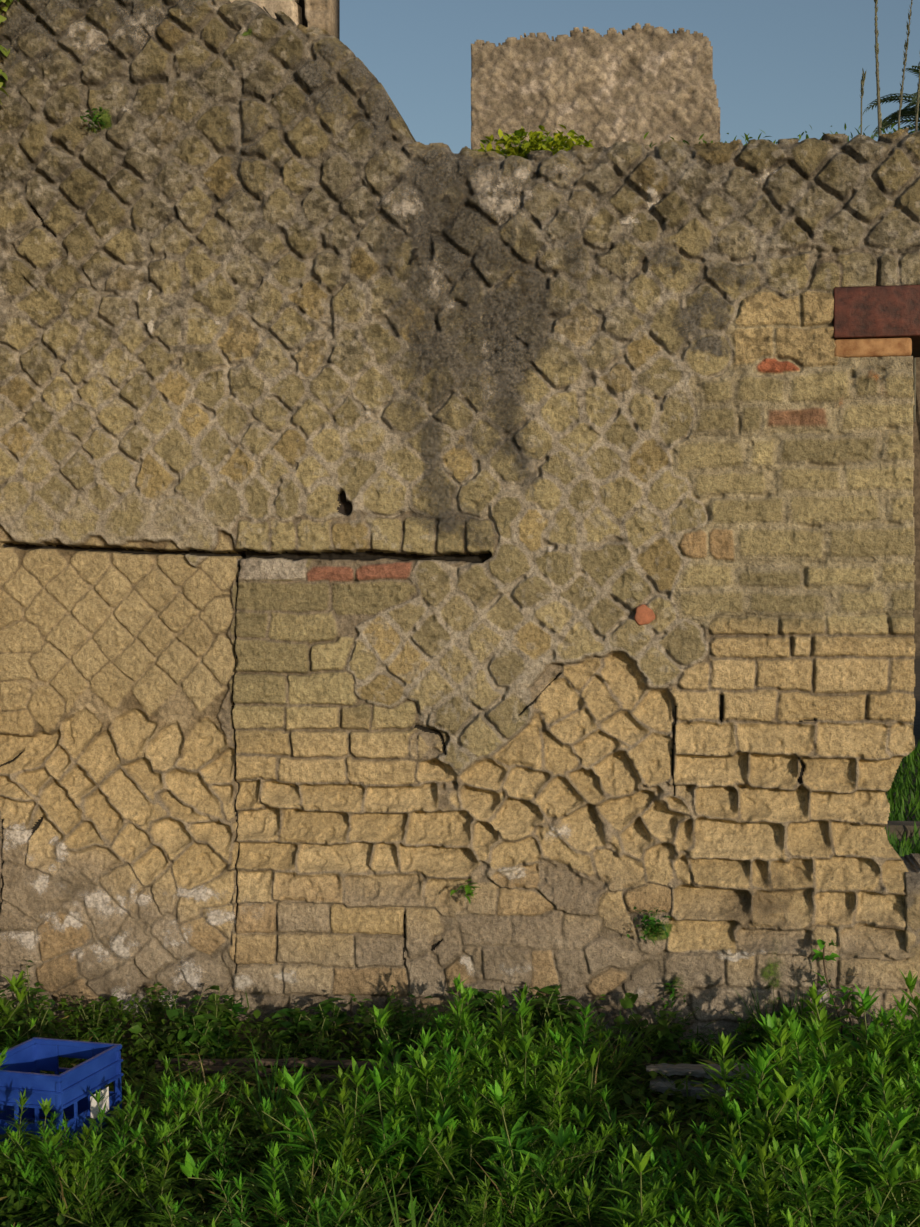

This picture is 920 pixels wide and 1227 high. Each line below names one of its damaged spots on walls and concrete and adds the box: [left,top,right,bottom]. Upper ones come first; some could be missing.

damp [289,42,401,151]
damp [388,151,551,546]
crack [0,543,492,974]
crack [518,672,562,716]
crack [670,706,678,796]
crack [718,695,726,722]
crack [797,758,805,784]